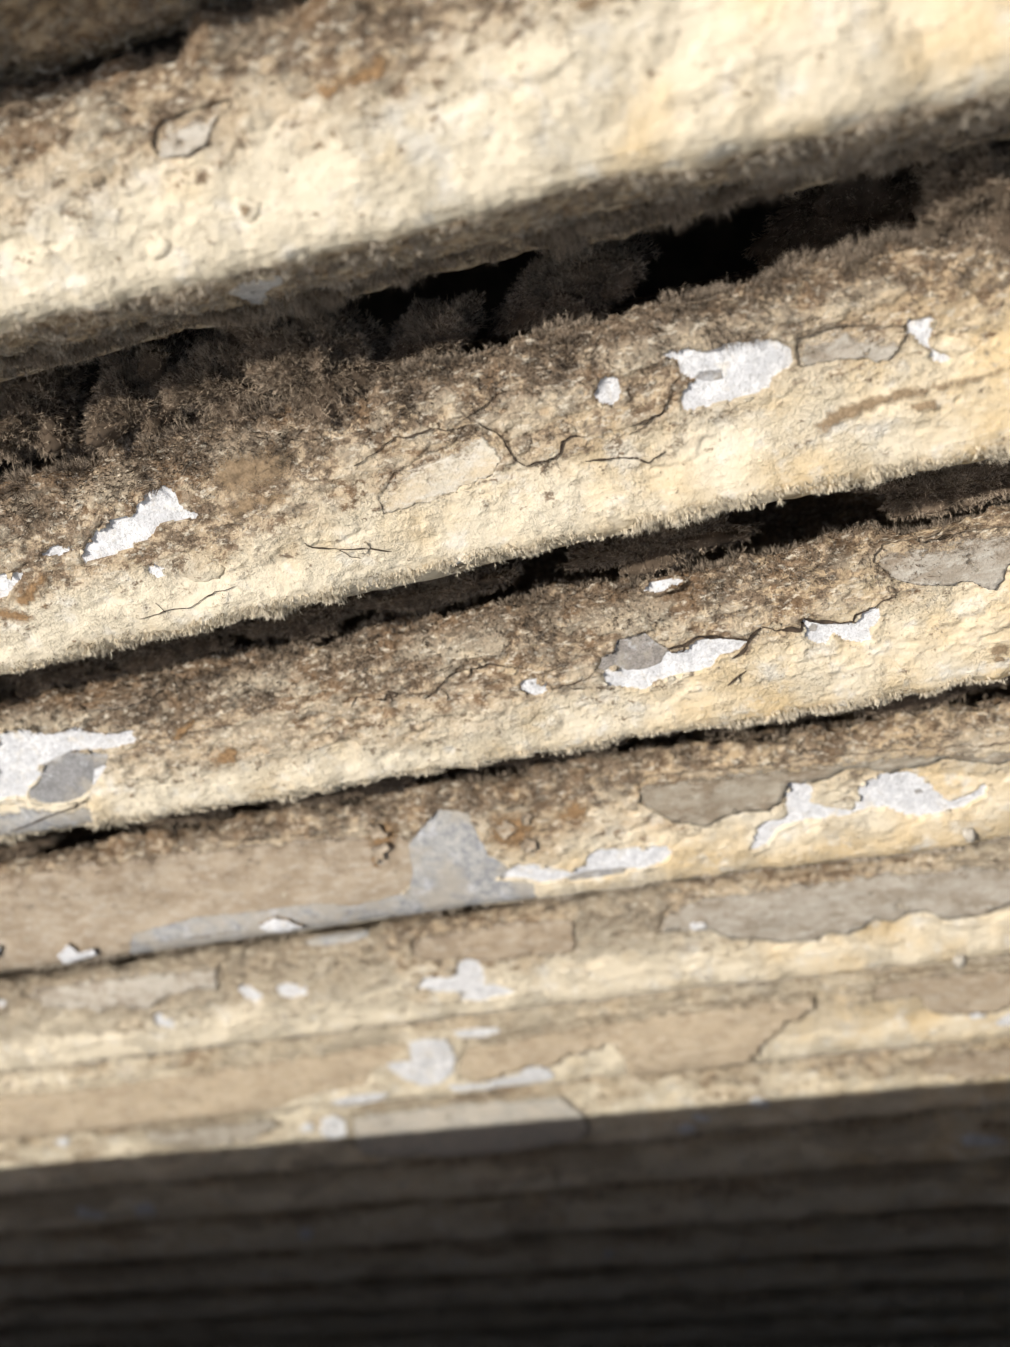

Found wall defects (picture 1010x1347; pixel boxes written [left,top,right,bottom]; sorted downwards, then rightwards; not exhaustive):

peeling [660,339,793,411]
crack [354,378,678,467]
peeling [42,485,198,564]
peeling [598,633,747,692]
peeling [801,607,880,644]
peeling [0,727,137,803]
peeling [750,771,987,849]
peeling [120,809,674,954]